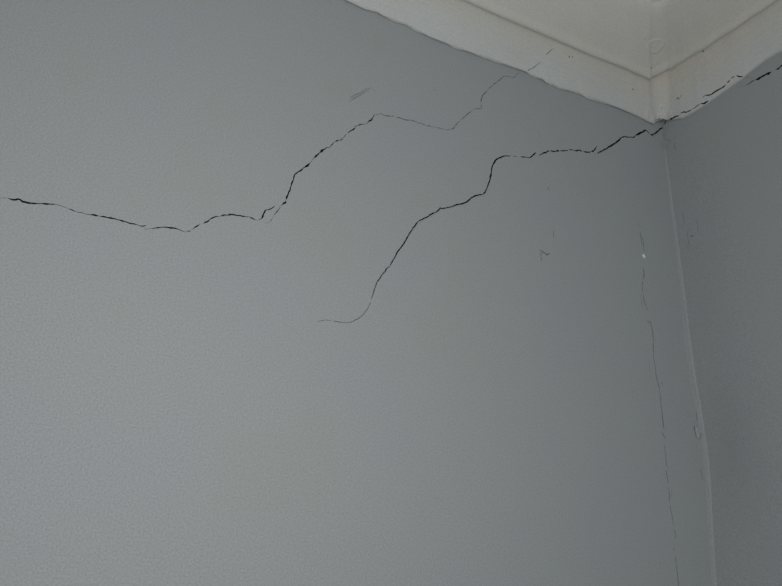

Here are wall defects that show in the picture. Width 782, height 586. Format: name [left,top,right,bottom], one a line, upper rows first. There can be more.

crack [8,49,552,232]
crack [321,65,782,323]
crack [641,269,679,586]